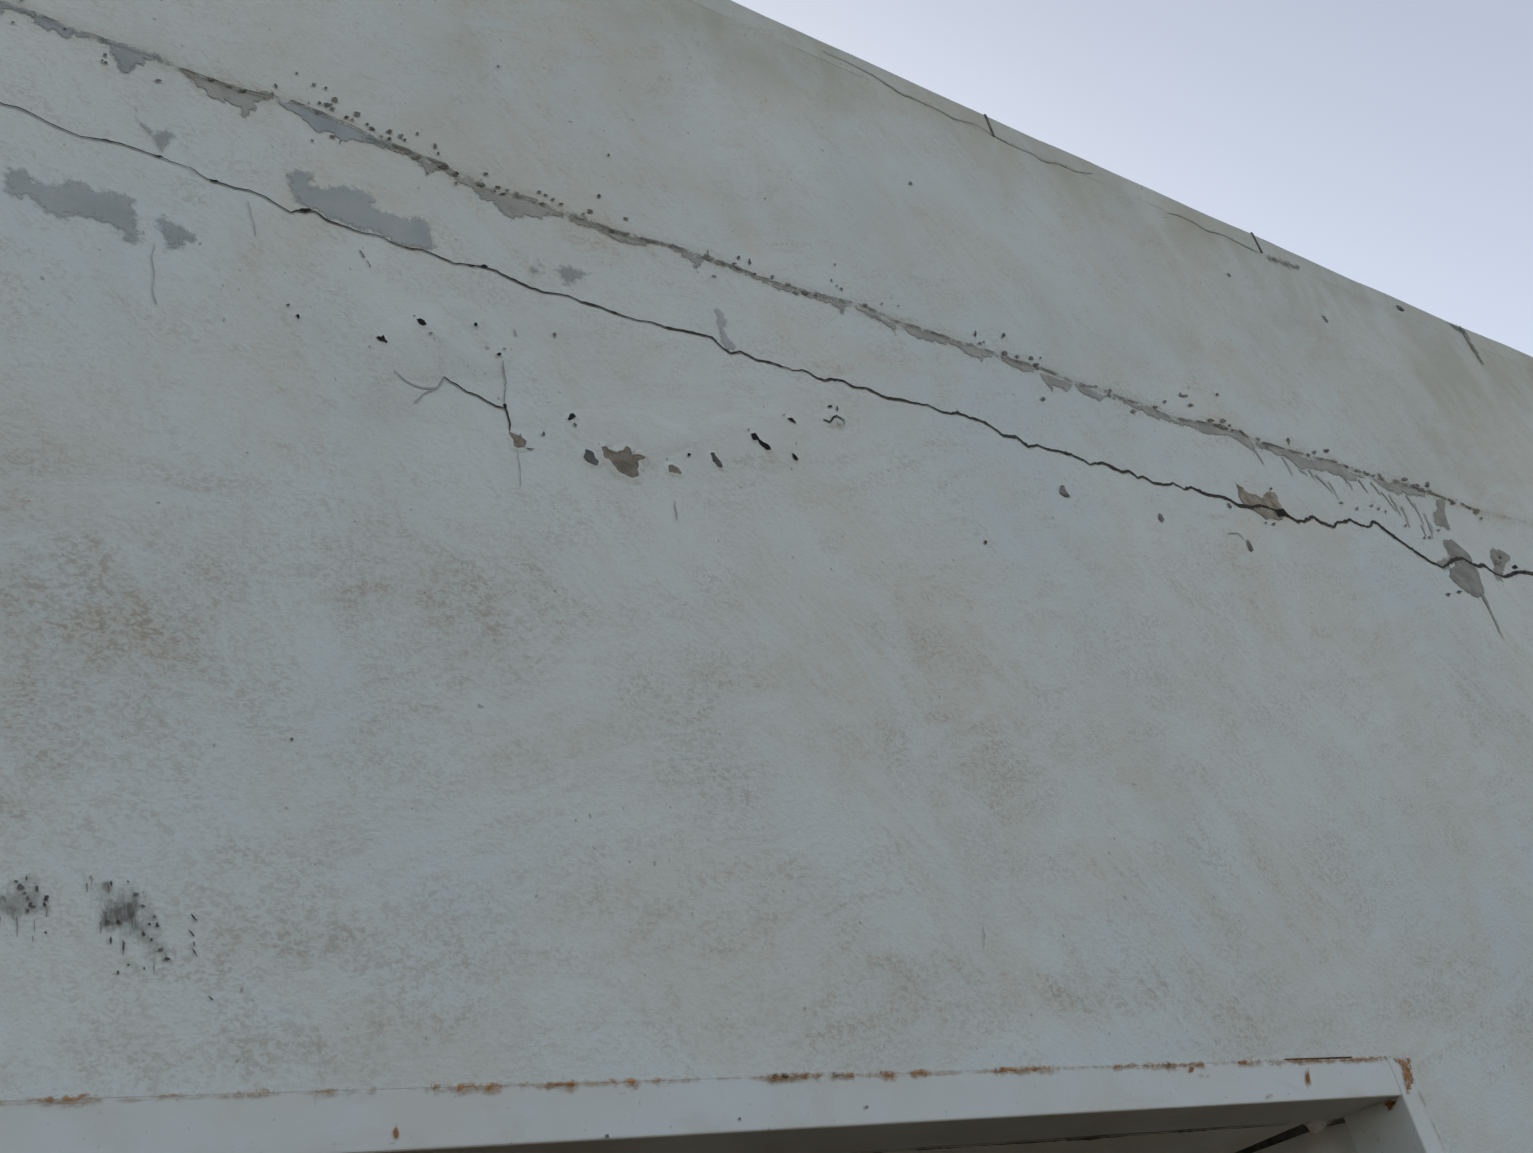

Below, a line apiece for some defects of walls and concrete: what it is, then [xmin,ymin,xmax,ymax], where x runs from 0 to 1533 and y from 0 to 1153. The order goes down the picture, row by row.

peeling [0,0,1510,639]
crack [0,102,1533,578]
leakage [0,875,49,941]
leakage [86,875,170,975]
rust [29,1094,92,1104]
rust [434,1083,498,1092]
rust [548,1078,635,1087]
rust [761,1073,854,1081]
rust [1114,1062,1203,1072]
rust [1344,1057,1413,1110]